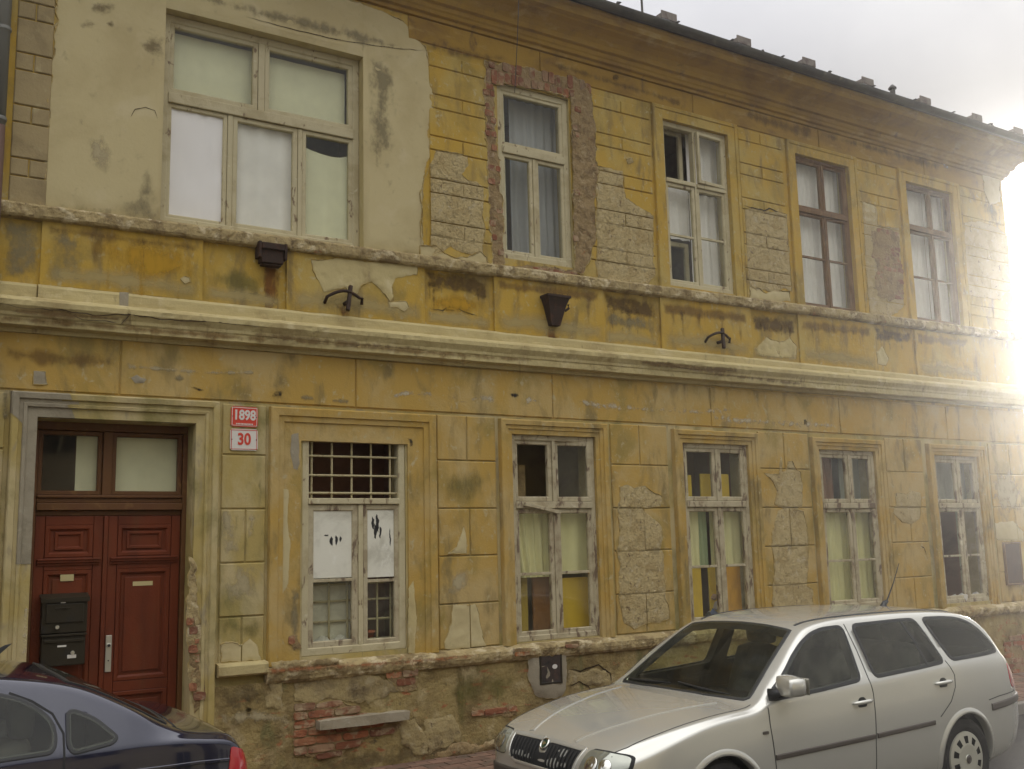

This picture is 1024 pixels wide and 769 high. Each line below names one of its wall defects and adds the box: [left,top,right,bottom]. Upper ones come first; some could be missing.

spalling [419,60,656,284]
corrosion [264,267,278,308]
spalling [311,258,418,311]
leakage [428,273,486,297]
spalling [745,208,793,302]
spalling [964,221,1013,300]
spalling [616,485,671,629]
spalling [764,457,814,607]
spalling [186,556,206,714]
flaking render [220,635,495,759]
spalling [444,603,486,650]
crack [570,664,612,689]